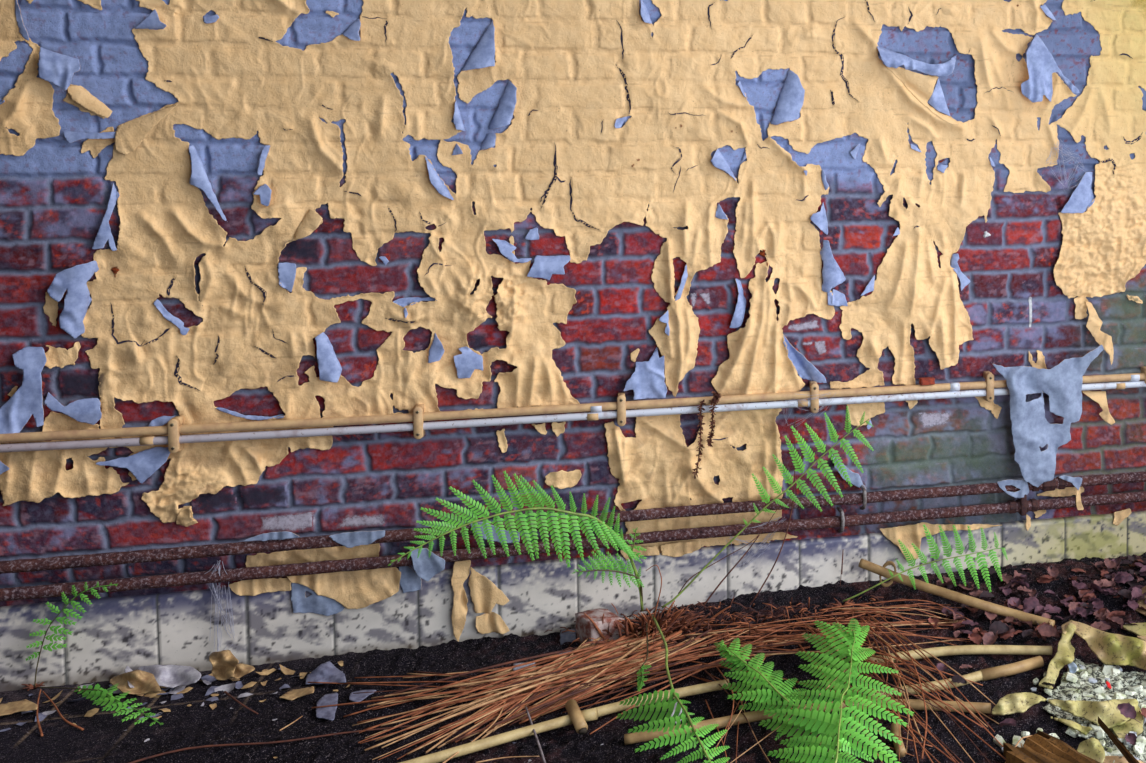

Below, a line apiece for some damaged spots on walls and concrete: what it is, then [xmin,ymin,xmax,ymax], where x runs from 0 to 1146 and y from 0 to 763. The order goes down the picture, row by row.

crack [830,0,875,105]
crack [540,143,599,230]
peeling [0,0,1146,553]
peeling [245,543,380,578]